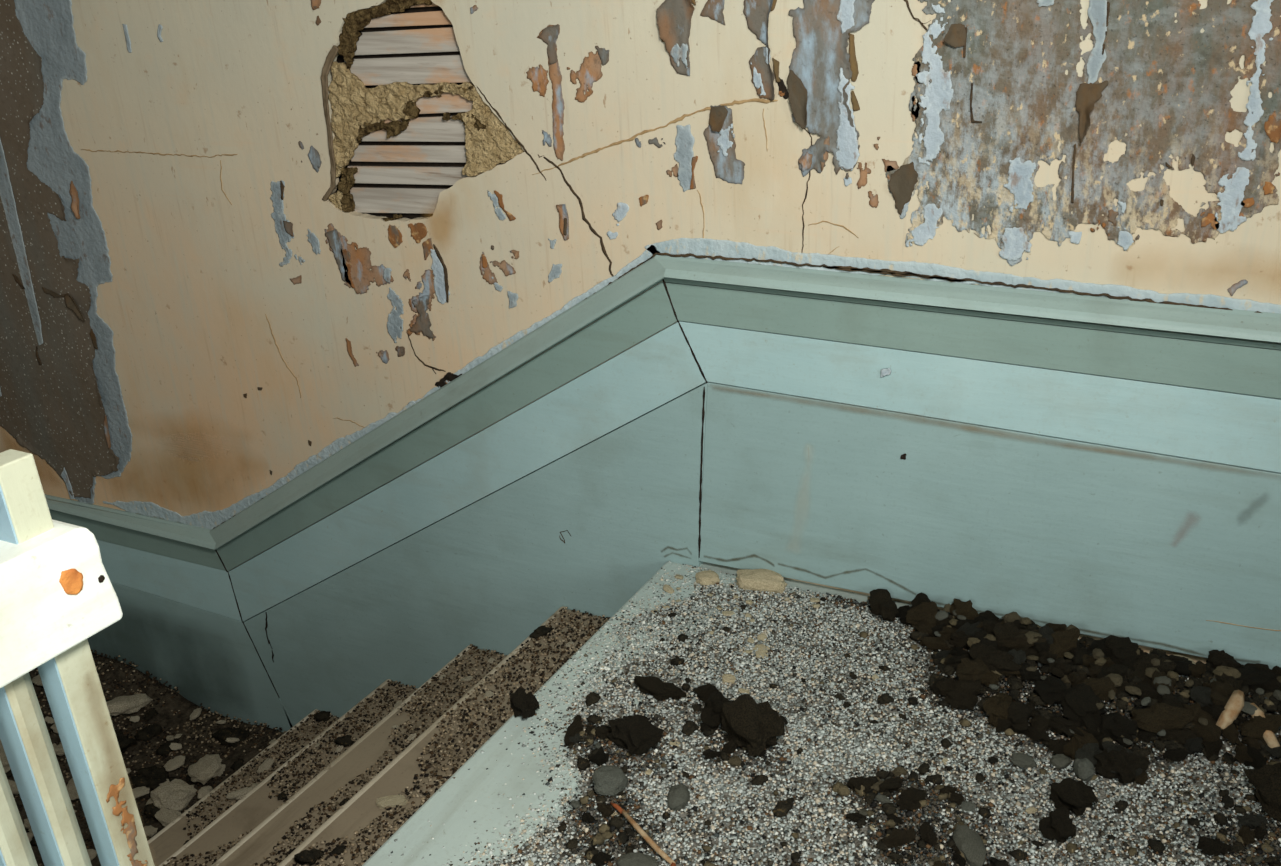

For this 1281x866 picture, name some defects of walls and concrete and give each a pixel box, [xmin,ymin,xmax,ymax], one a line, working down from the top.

peeling [837,0,855,34]
flaking render [298,0,525,221]
peeling [526,64,549,97]
peeling [635,124,698,192]
peeling [717,124,735,156]
peeling [751,47,789,99]
peeling [911,61,921,122]
peeling [345,338,359,367]
peeling [376,249,450,364]
flaking render [435,372,462,387]
crack [477,87,1261,558]
rust [106,777,148,866]